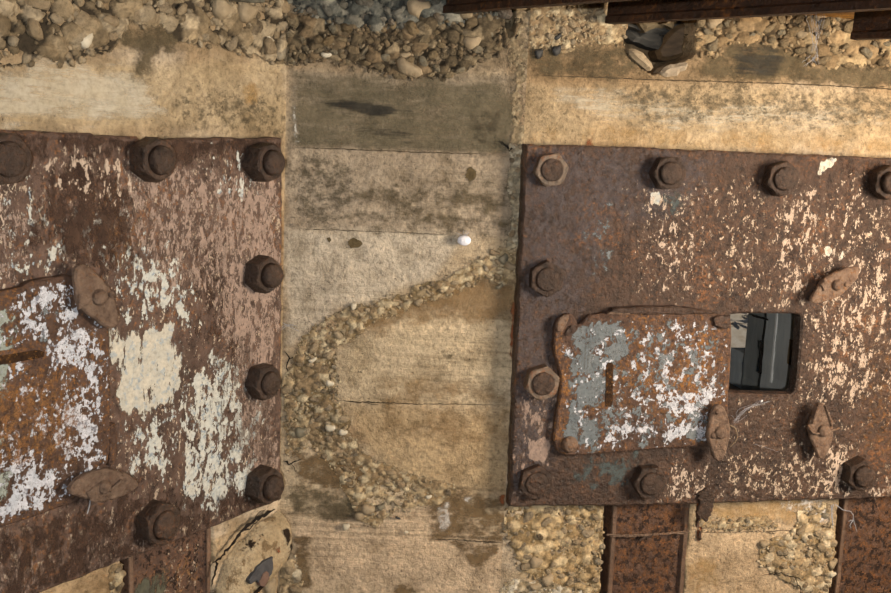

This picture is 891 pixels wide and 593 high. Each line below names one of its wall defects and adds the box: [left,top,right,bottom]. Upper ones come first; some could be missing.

rust [165,139,281,168]
rust [29,136,147,275]
peeling [584,199,619,274]
rust [195,242,240,364]
peeling [643,175,890,404]
rust [0,372,88,471]
peeling [518,318,715,490]
rust [613,342,717,421]
rust [0,486,210,593]
peeling [163,541,201,593]
rust [220,491,264,520]
rust [840,497,891,593]